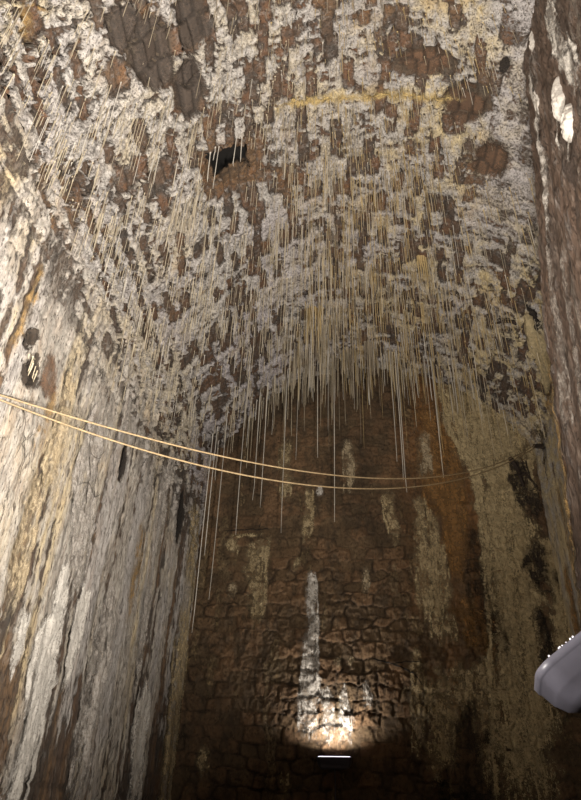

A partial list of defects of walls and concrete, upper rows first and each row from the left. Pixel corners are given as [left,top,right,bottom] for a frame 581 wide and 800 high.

spalling [204,147,256,184]
spalling [22,327,58,400]
damp [297,572,353,734]
damp [410,382,572,800]